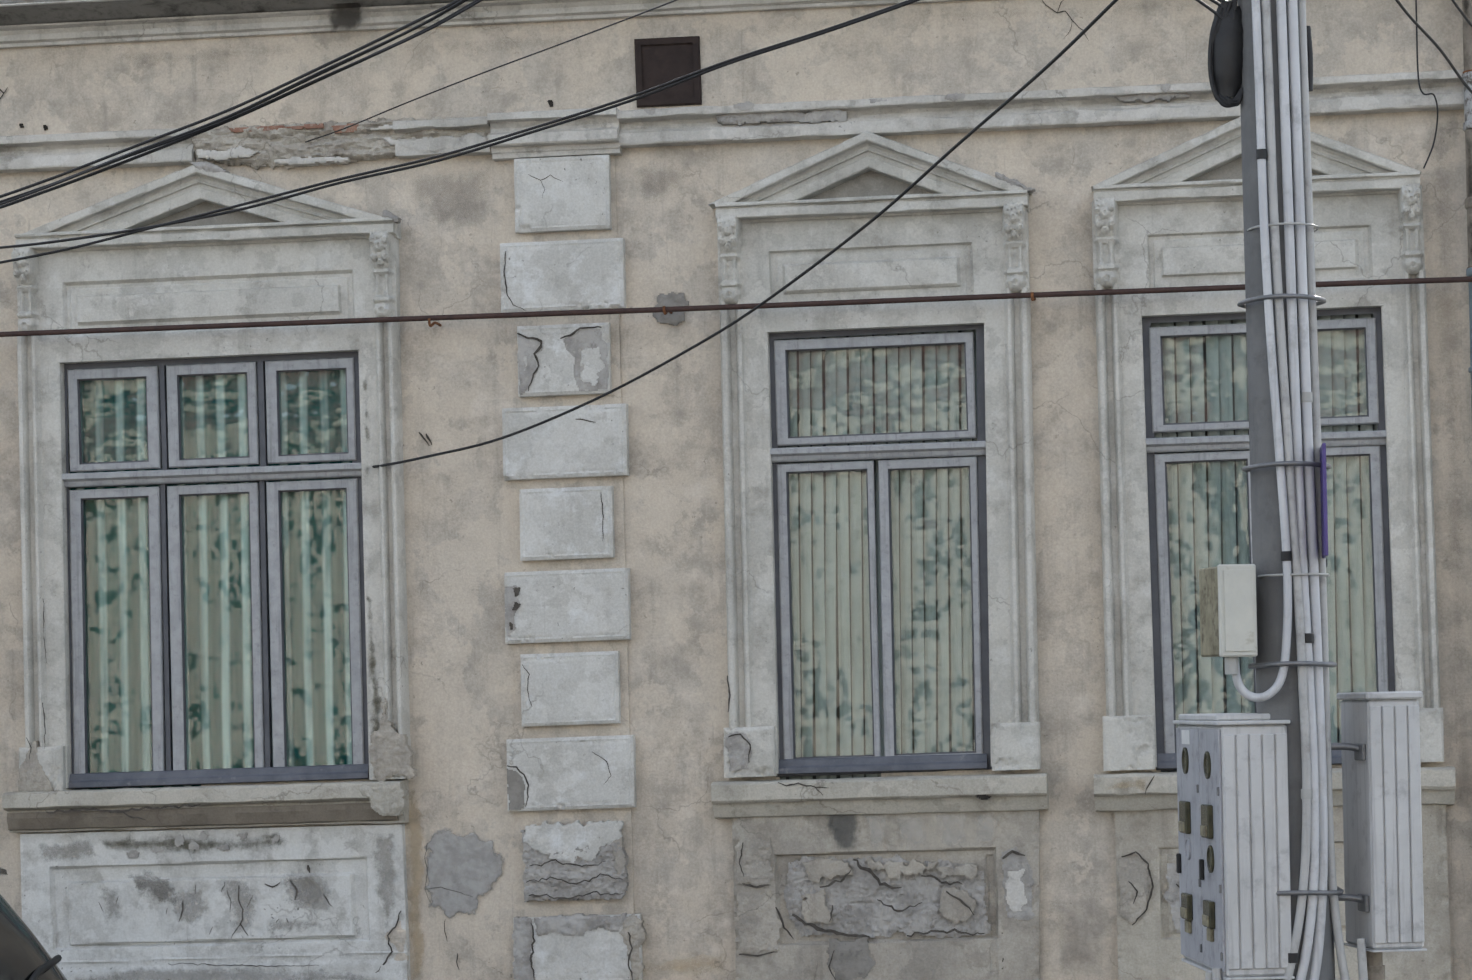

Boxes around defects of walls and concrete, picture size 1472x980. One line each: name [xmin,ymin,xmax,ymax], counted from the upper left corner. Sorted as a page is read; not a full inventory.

spalling [190,116,488,173]
spalling [359,645,417,816]
spalling [512,820,647,980]
spalling [735,836,1035,980]
spalling [1117,851,1180,933]